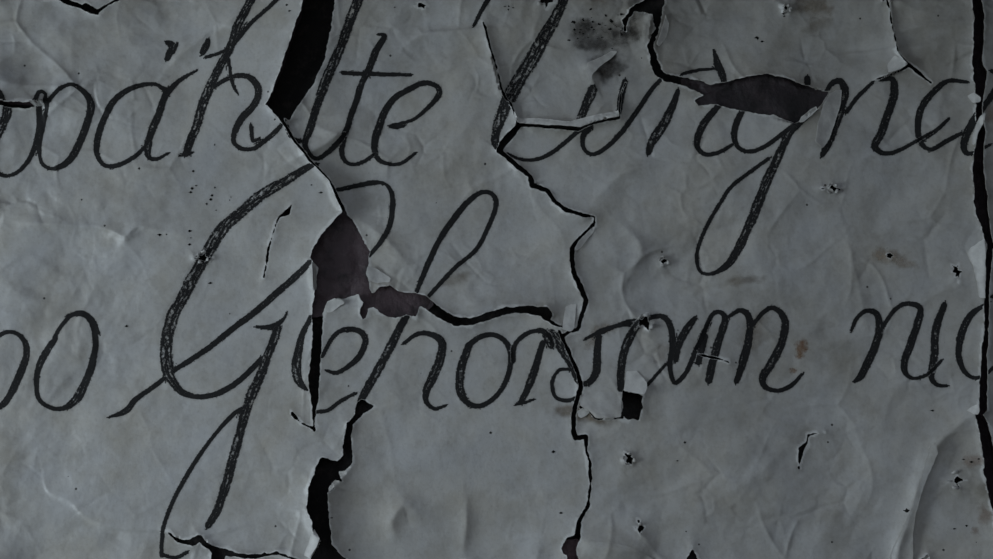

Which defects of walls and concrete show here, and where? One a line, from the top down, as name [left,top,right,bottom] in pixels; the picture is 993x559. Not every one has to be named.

crack [622,0,683,85]
peeling [681,74,828,123]
peeling [310,210,434,319]
crack [428,22,643,552]
crack [972,0,993,509]
crack [699,354,729,363]
peeling [562,539,579,559]